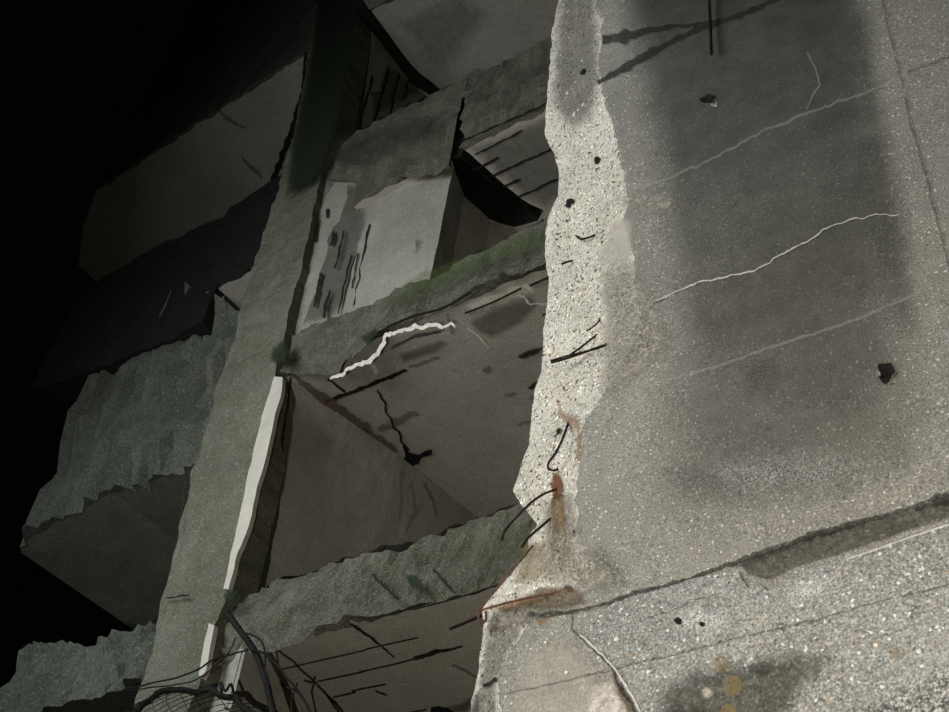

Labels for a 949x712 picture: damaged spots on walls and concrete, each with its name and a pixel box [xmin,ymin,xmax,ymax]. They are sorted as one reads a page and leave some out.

crack [597,0,778,85]
damp [642,0,865,196]
crack [640,214,899,309]
spalling [317,0,670,712]
crack [327,369,409,451]
corrosion [550,473,563,529]
crack [528,492,949,712]
damp [664,659,819,712]